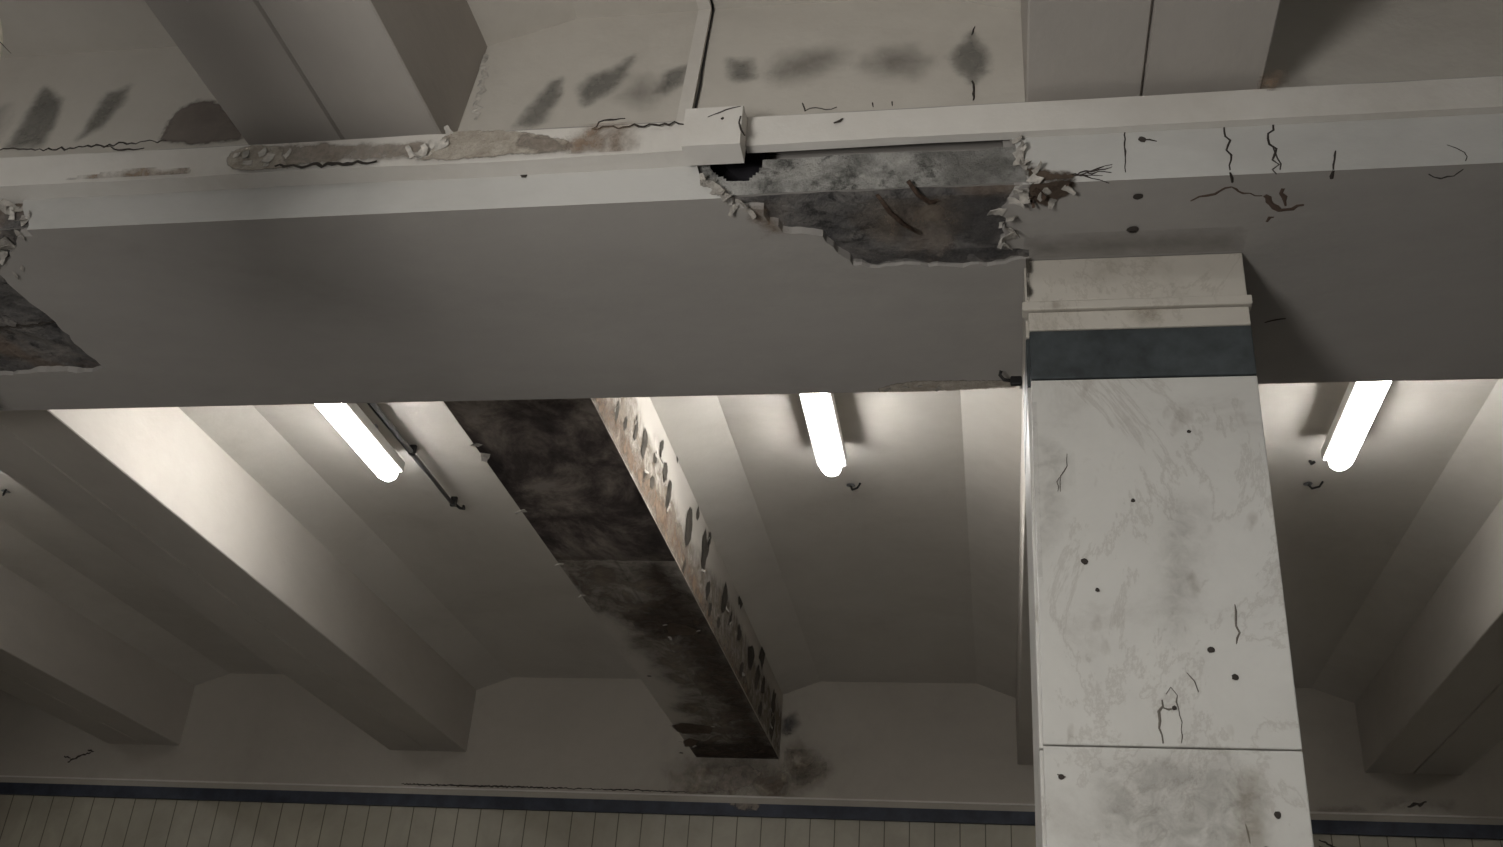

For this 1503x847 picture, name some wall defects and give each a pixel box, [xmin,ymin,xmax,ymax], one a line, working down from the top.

damp [524,81,559,123]
damp [583,67,625,100]
damp [660,69,684,91]
damp [955,27,984,100]
crack [1190,124,1304,222]
crack [1328,151,1336,179]
crack [1428,145,1468,179]
spalling [698,135,1112,297]
spalling [0,198,101,372]
peeling [614,402,678,512]
peeling [682,506,776,739]
crack [1157,673,1199,744]